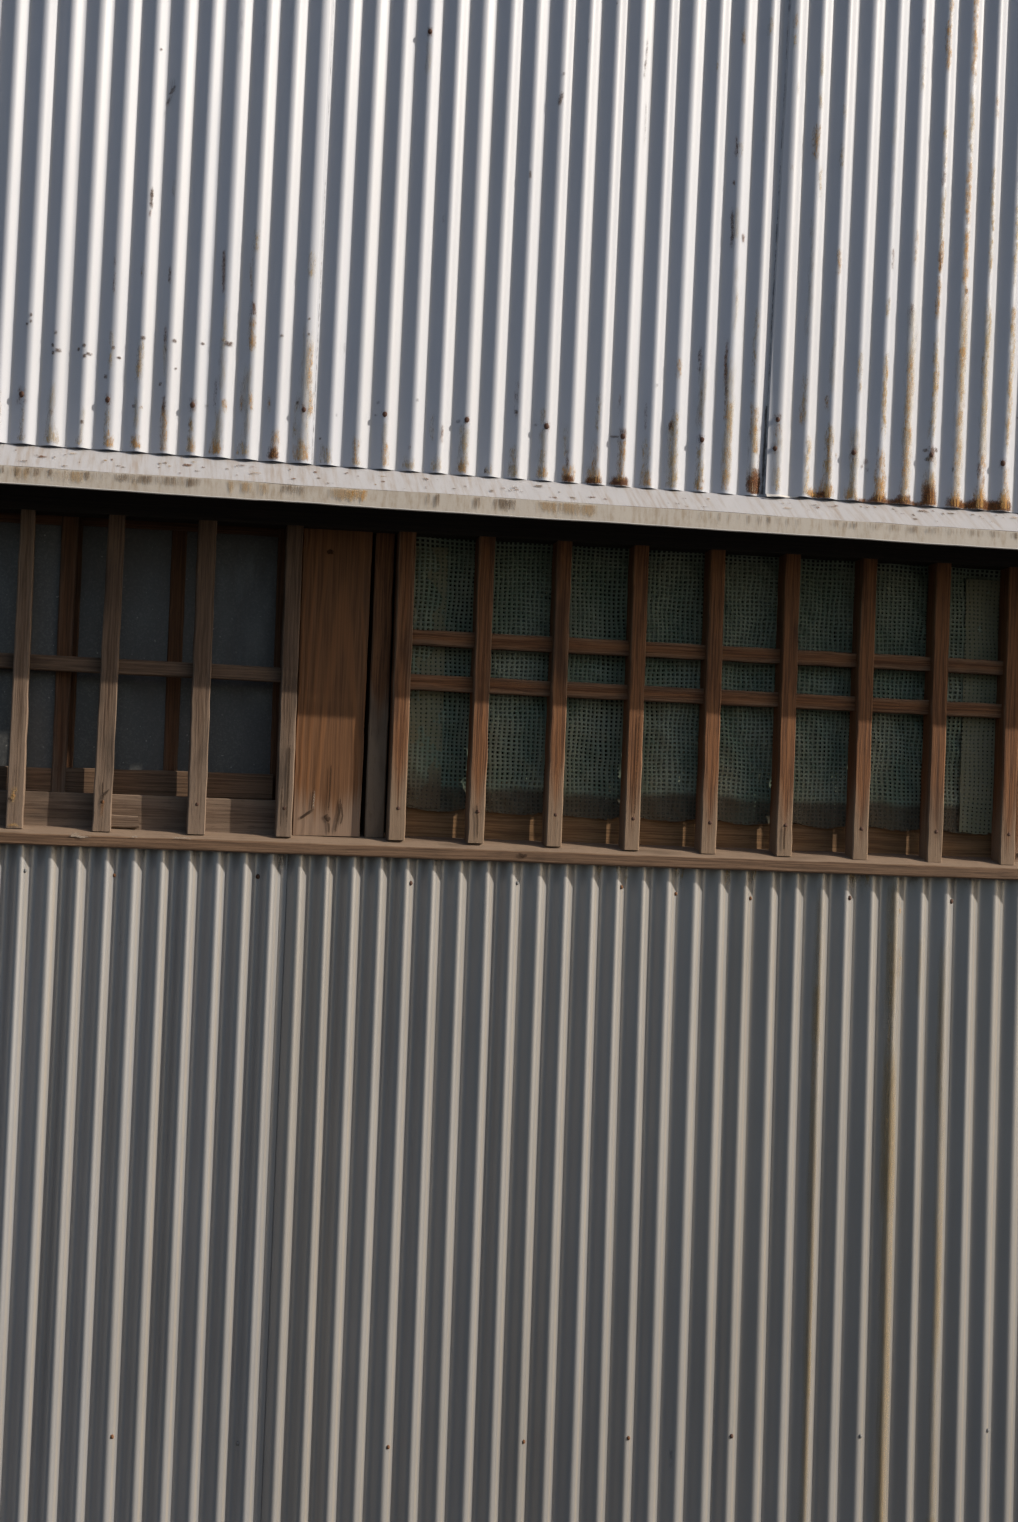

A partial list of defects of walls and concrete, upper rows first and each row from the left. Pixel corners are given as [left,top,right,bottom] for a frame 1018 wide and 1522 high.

corrosion [804,101,1012,511]
corrosion [188,394,270,455]
corrosion [537,406,679,488]
leakage [116,474,197,487]
leakage [334,489,367,502]
leakage [540,502,595,515]